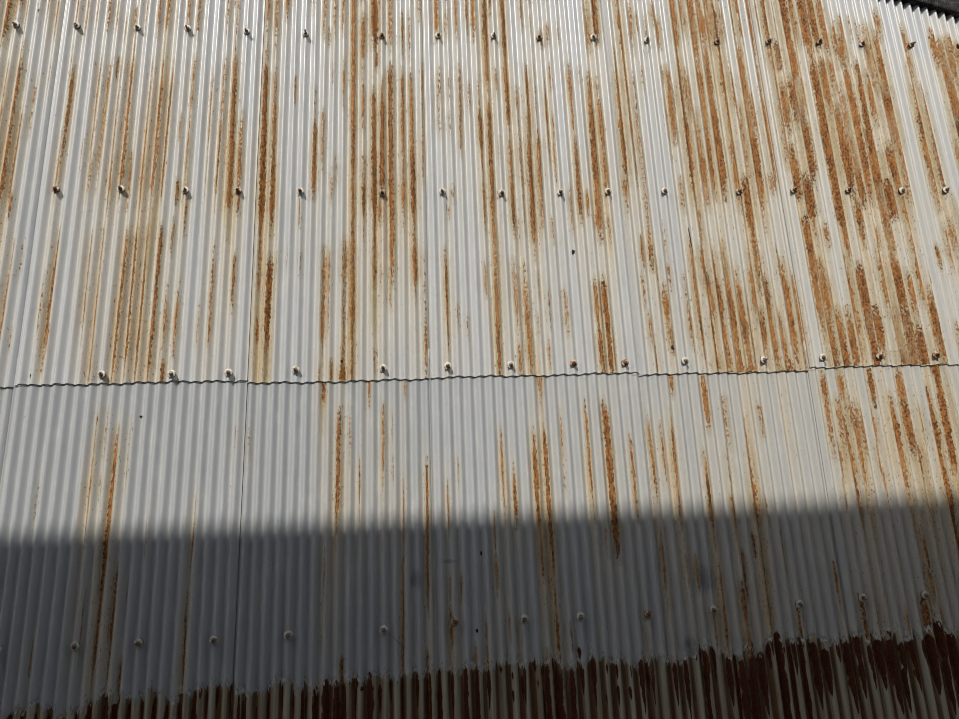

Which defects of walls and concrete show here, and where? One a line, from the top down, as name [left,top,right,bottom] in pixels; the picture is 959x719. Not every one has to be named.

corrosion [0,238,23,350]
corrosion [0,0,64,221]
corrosion [35,231,60,372]
corrosion [54,46,77,184]
corrosion [76,0,245,383]
corrosion [253,0,303,382]
corrosion [298,90,338,229]
corrosion [313,0,573,680]
corrosion [565,0,959,658]